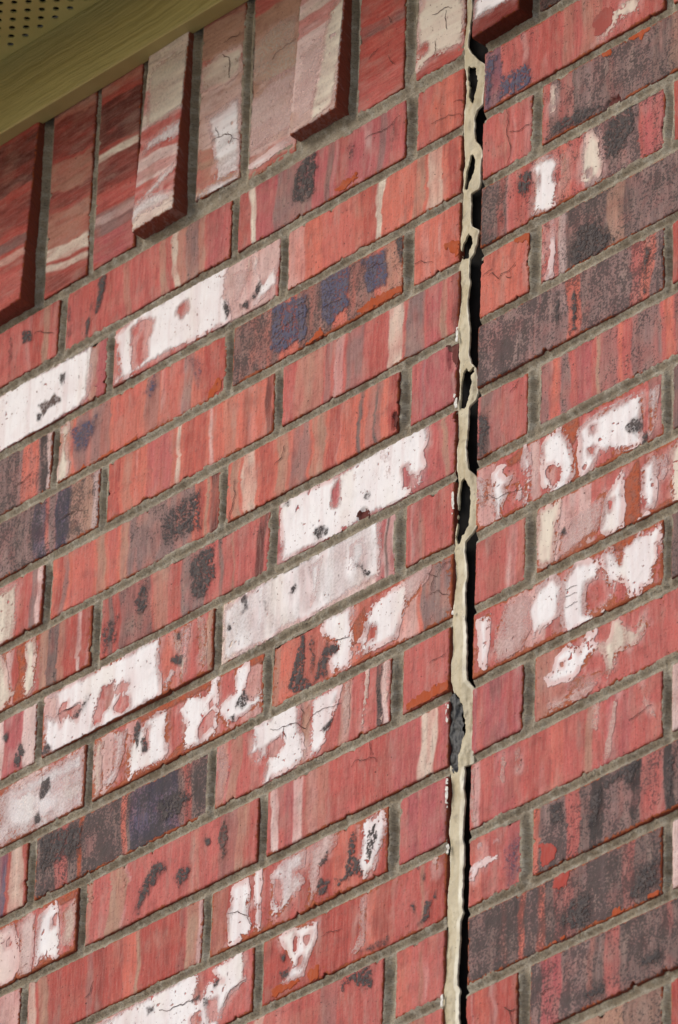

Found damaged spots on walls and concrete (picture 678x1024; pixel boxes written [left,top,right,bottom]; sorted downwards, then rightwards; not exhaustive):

water stain [477,415,490,456]
water stain [625,418,647,444]
crack [430,0,531,1024]
water stain [288,635,338,692]
water stain [134,722,148,752]